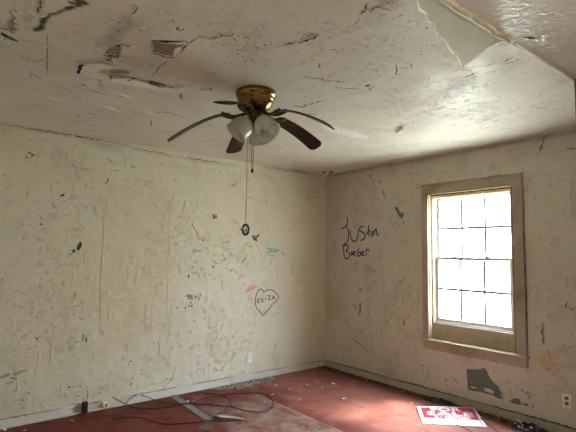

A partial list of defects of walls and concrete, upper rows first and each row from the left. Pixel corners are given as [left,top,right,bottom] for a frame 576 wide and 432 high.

crack [27,0,50,18]
peeling [415,0,509,68]
peeling [71,37,198,92]
spalling [466,367,535,409]